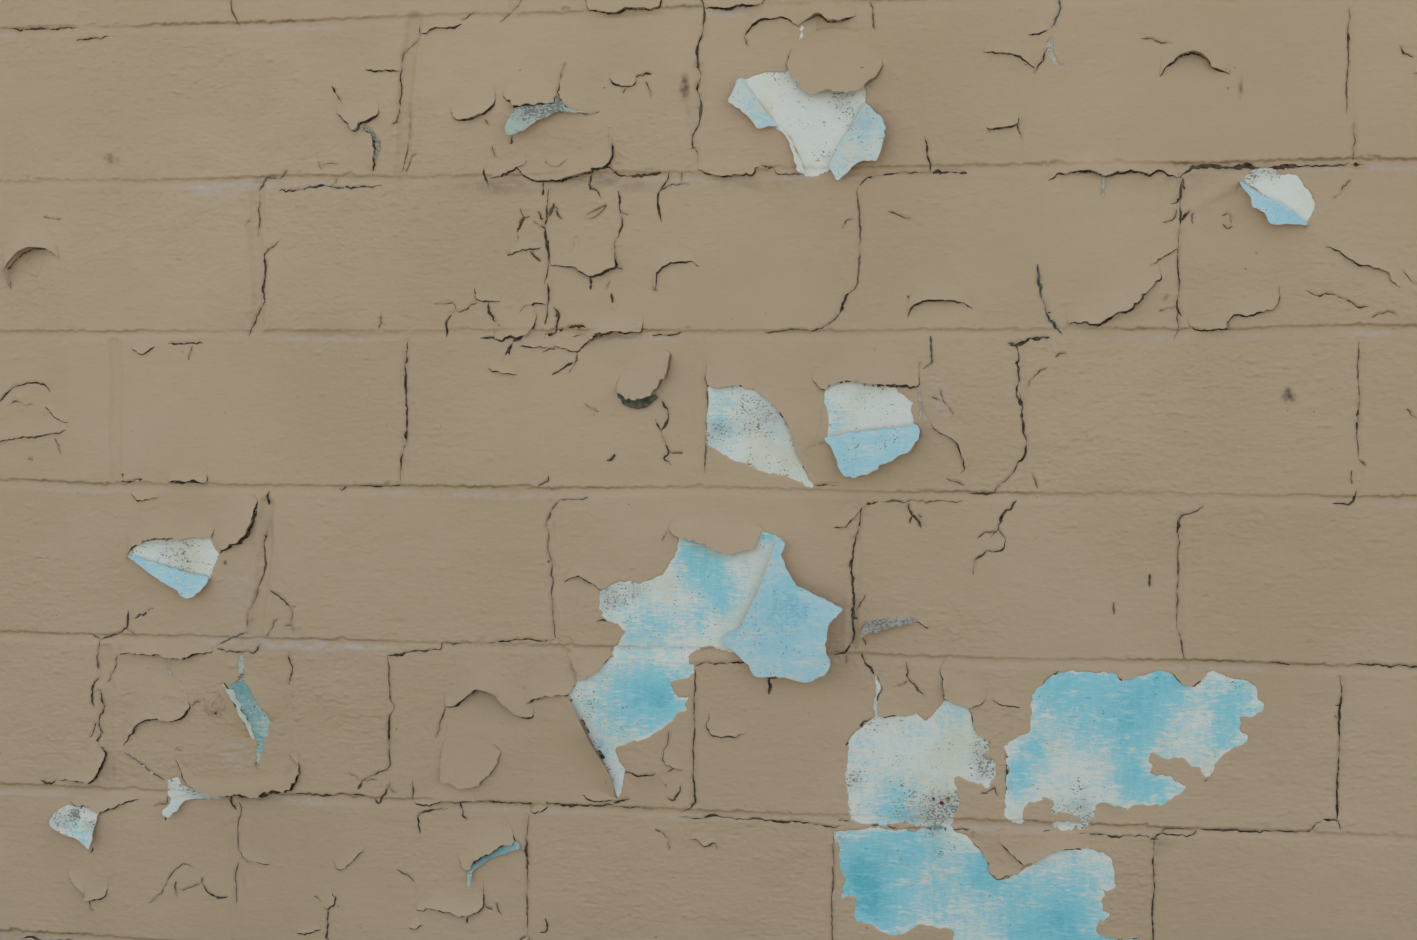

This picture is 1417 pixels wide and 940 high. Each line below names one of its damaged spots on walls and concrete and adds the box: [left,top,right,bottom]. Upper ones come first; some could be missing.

peeling [445,58,683,465]
crack [482,166,661,358]
peeling [657,0,886,222]
peeling [1222,168,1315,251]
peeling [121,464,258,618]
peeling [704,330,983,488]
crack [833,336,1066,662]
crack [91,608,153,733]
crack [150,802,242,903]
peeling [409,511,842,930]
crack [490,661,901,940]
peeling [834,611,1264,940]